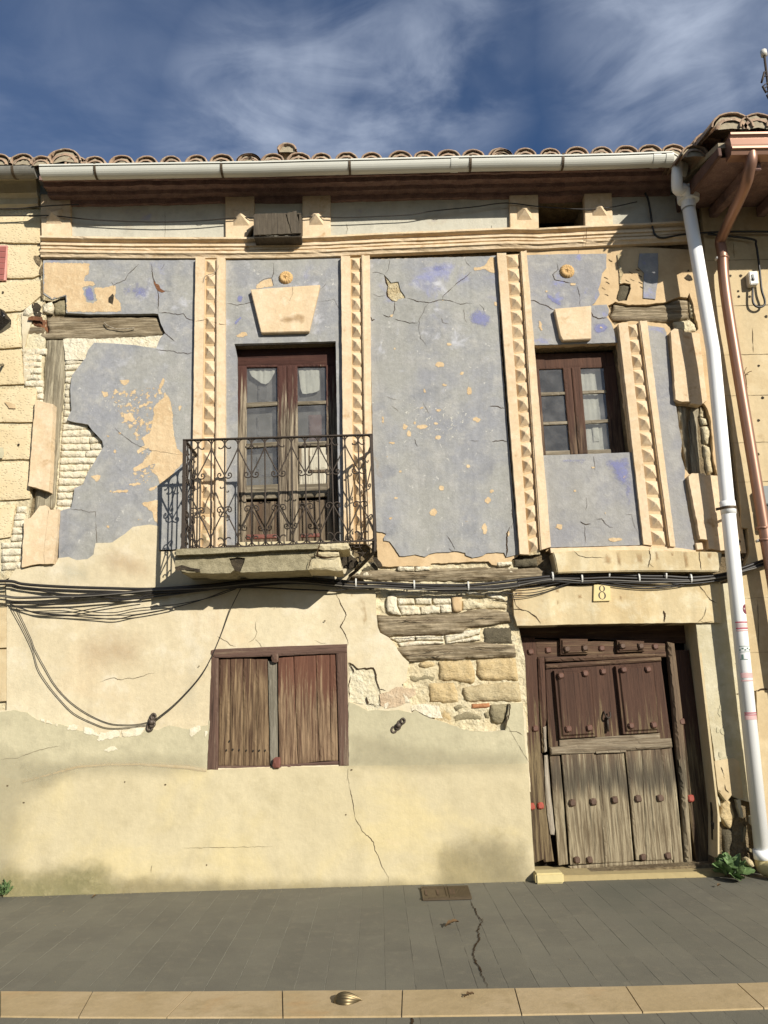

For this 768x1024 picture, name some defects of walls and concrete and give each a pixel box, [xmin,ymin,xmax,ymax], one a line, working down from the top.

peeling [23,256,122,317]
crack [371,261,484,342]
flaking render [616,253,629,301]
flaking render [22,348,47,402]
flaking render [57,335,183,523]
peeling [403,389,481,440]
flaking render [1,506,27,571]
spalling [349,545,545,732]
peeling [41,719,144,752]
crack [472,904,488,986]